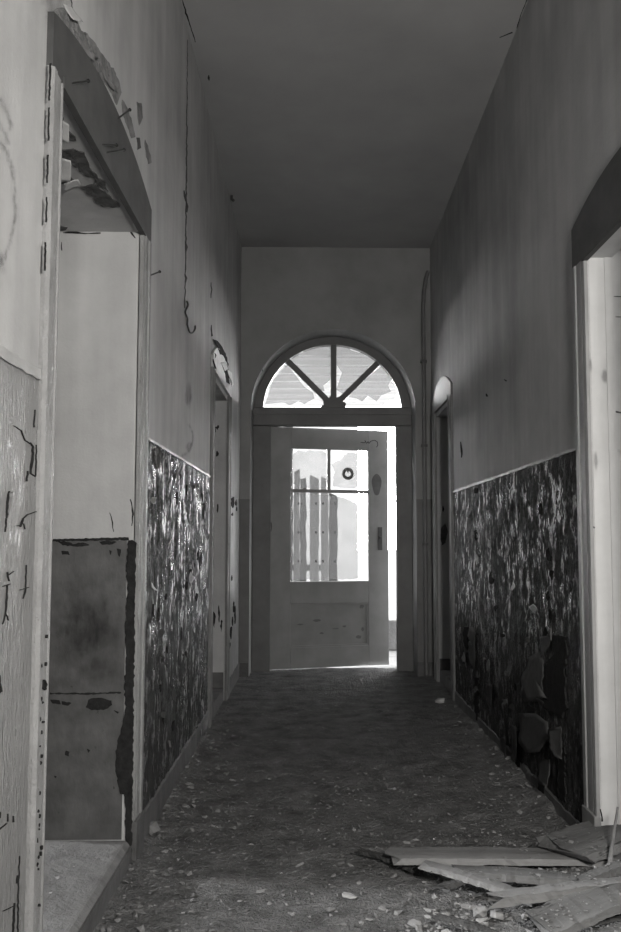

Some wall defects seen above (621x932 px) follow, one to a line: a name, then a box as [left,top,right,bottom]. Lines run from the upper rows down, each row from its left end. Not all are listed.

flaking render [53,4,152,164]
flaking render [61,117,120,208]
crack [182,0,210,308]
peeling [213,339,233,387]
peeling [154,447,162,470]
peeling [171,466,205,519]
peeling [167,539,210,601]
peeling [151,582,168,663]
peeling [461,591,569,802]